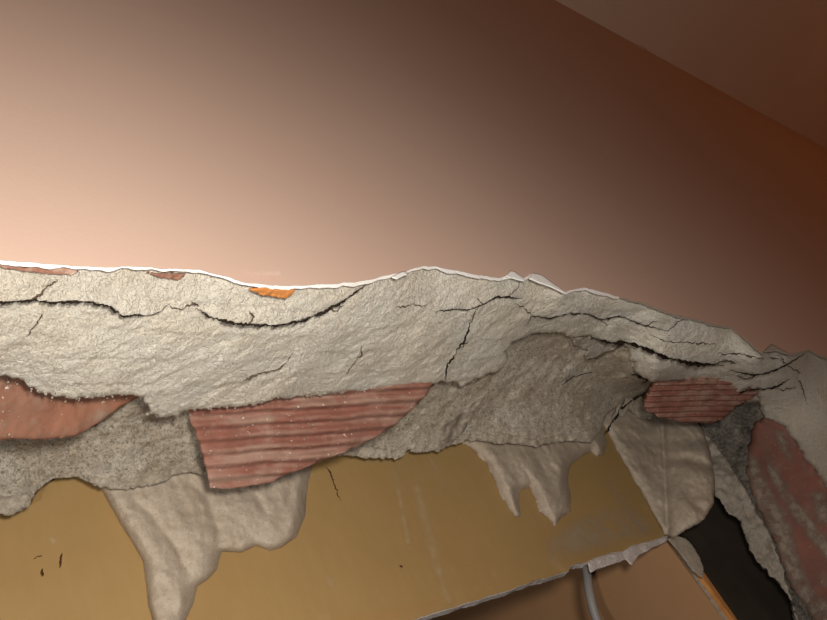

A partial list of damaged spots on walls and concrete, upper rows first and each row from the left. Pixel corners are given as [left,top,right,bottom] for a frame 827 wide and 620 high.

crack [0,279,371,335]
crack [241,352,294,383]
crack [396,282,807,405]
spalling [0,260,827,620]